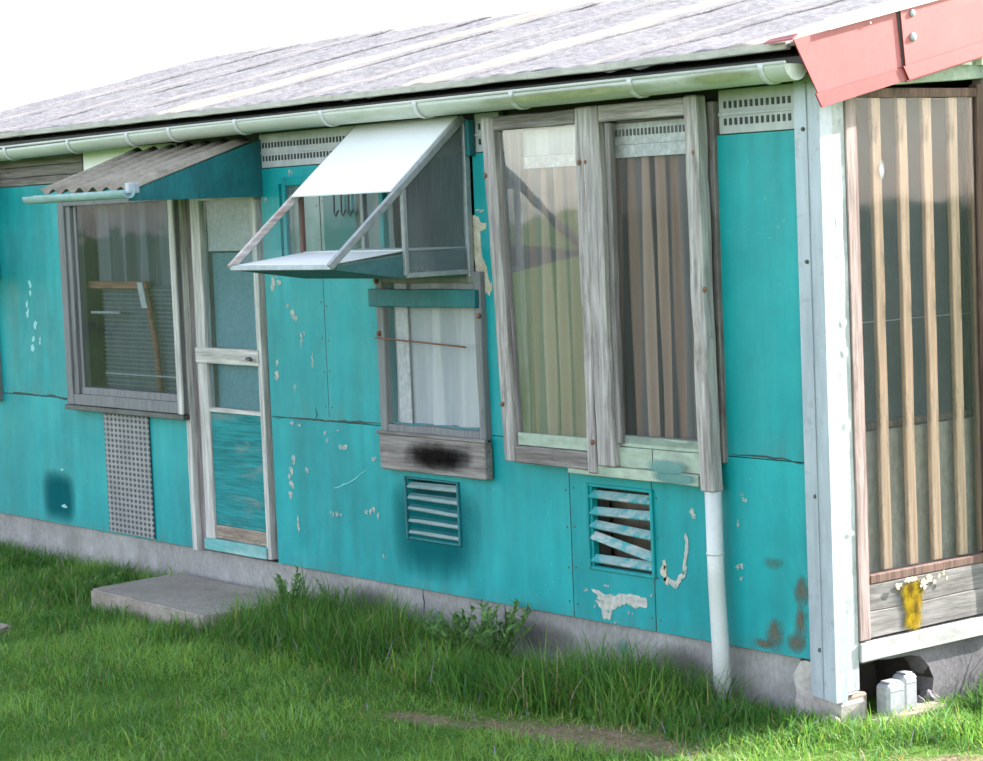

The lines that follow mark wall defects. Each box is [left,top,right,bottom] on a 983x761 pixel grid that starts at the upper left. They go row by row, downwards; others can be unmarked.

peeling [472,209,493,296]
peeling [26,280,41,352]
crack [4,392,68,400]
water stain [47,478,71,515]
peeling [288,455,309,499]
crack [732,454,804,464]
peeling [660,533,689,589]
peeling [895,570,948,590]
peeling [584,584,653,629]
corrosion [758,579,808,650]